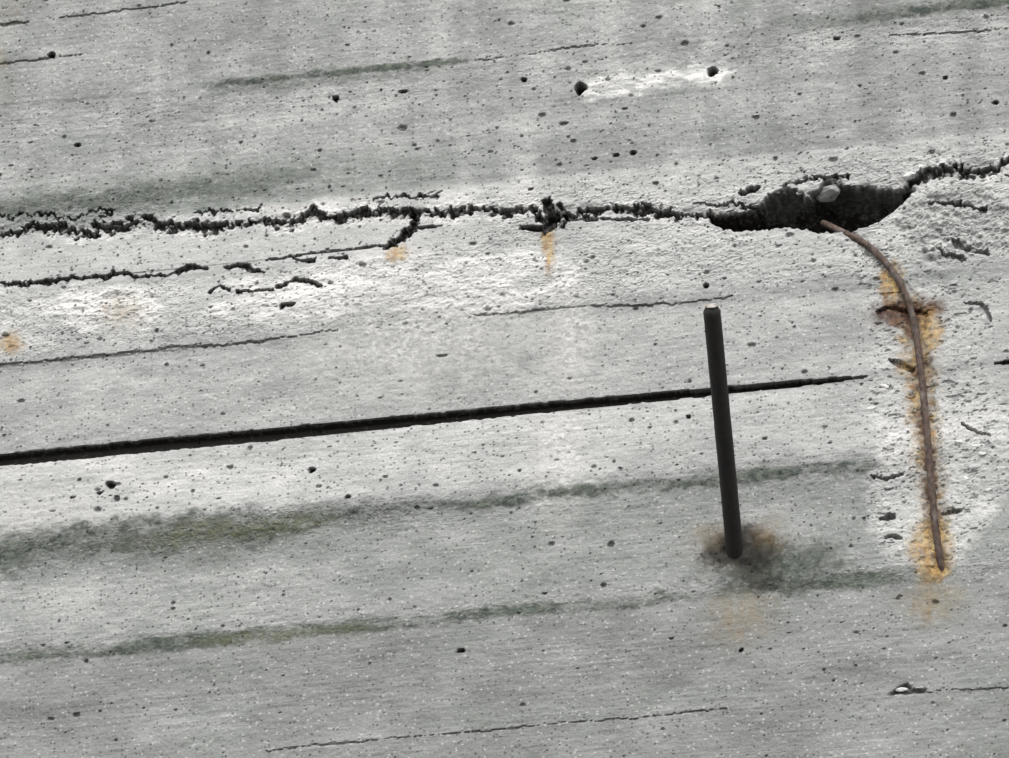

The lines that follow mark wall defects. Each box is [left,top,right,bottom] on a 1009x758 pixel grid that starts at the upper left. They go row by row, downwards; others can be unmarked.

crack [903,155,1009,214]
crack [0,172,852,310]
crack [473,294,735,317]
crack [0,328,339,367]
spalling [835,185,1009,581]
corrosion [877,267,948,576]
corrosion [706,526,772,584]